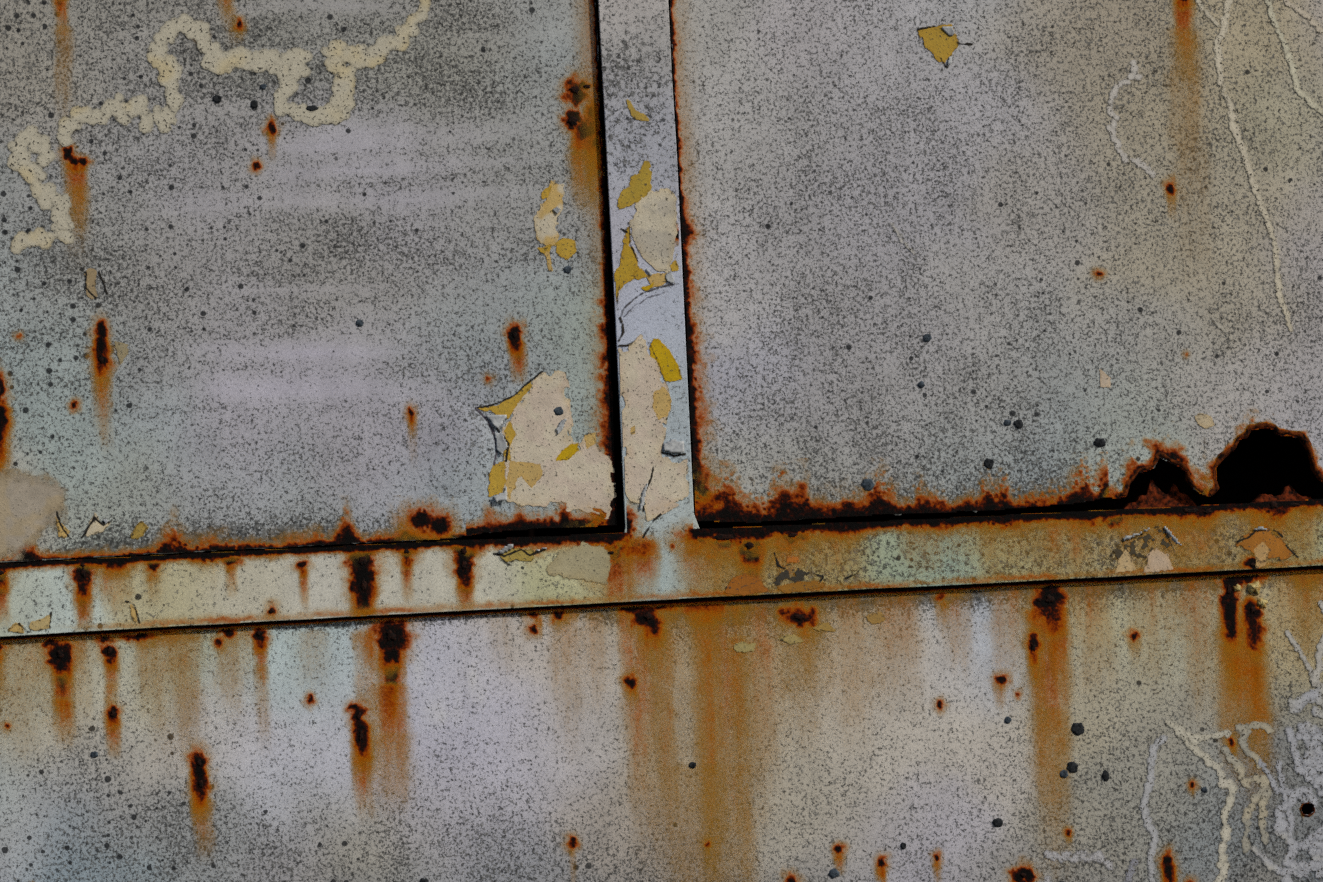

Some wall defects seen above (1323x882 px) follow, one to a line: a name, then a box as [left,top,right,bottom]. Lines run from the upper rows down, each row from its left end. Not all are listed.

peeling [917,23,973,68]
peeling [534,180,576,271]
peeling [614,161,679,301]
corrosion [670,0,1323,580]
corrosion [0,0,819,794]
peeling [475,334,690,538]
corrosion [811,582,907,603]
corrosion [935,573,1069,746]
corrosion [1113,556,1323,739]
corrosion [187,747,211,835]